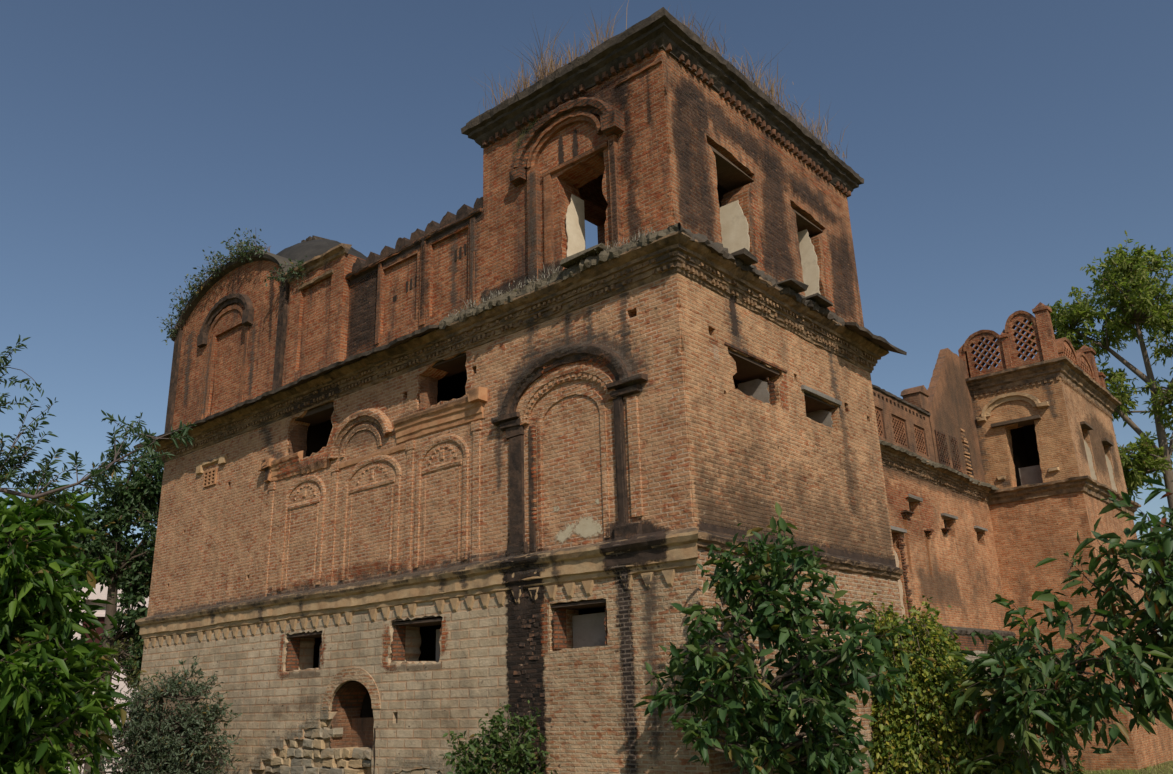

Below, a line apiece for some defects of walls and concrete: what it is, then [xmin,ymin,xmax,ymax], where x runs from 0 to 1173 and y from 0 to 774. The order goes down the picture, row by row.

peeling [530,414,604,545]
damp [145,527,562,774]